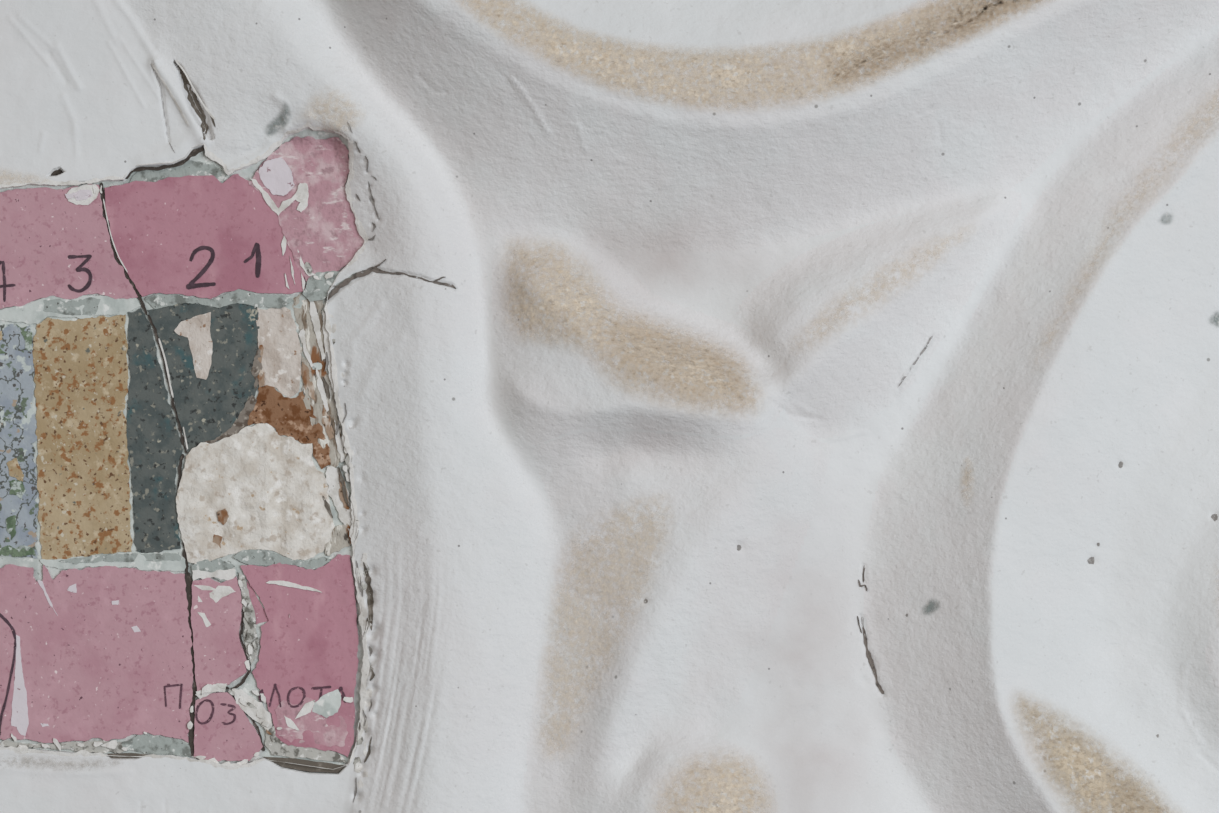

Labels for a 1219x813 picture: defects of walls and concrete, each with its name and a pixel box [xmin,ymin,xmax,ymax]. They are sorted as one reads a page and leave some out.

crack [100,60,215,493]
crack [326,122,456,301]
peeling [0,122,375,802]
crack [182,540,197,756]
crack [857,565,884,694]